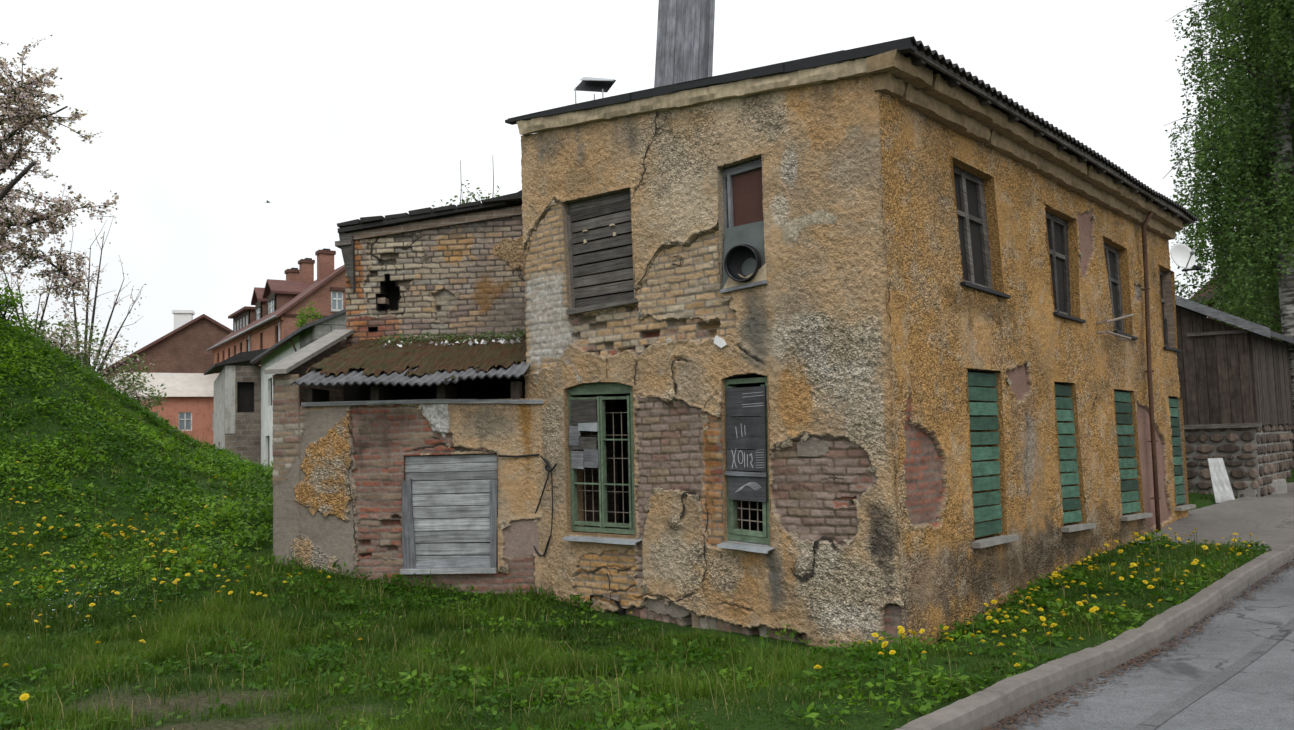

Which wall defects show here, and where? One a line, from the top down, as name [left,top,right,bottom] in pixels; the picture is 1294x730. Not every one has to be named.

crack [631,111,667,199]
spalling [510,198,578,375]
crack [637,224,718,284]
spalling [635,230,736,348]
crack [606,357,717,410]
spalling [351,404,542,595]
crack [575,490,754,612]
spalling [573,397,807,644]
crack [791,536,836,581]
crack [774,434,872,466]
spalling [771,432,878,546]
spalling [903,399,943,526]